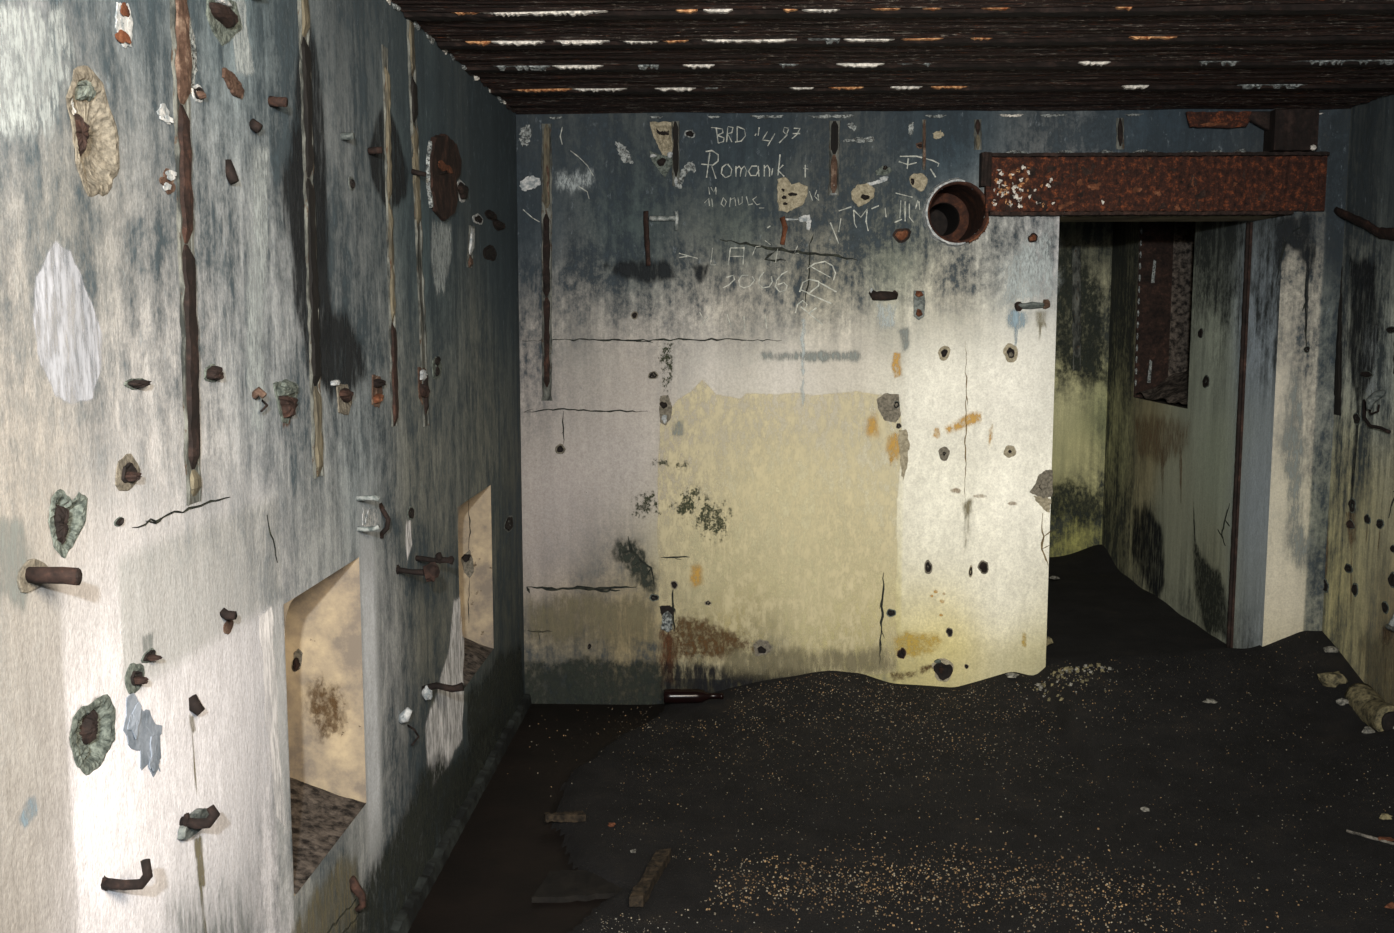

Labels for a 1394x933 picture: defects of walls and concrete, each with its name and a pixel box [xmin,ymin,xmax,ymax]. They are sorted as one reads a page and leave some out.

spalling [66,65,120,197]
corrosion [159,168,177,194]
corrosion [998,165,1101,212]
leakage [1007,235,1107,382]
spalling [48,489,88,558]
crack [132,497,230,528]
crack [267,515,278,563]
spalling [1030,470,1053,513]
leakage [223,620,234,634]
leakage [296,319,939,933]
spalling [69,693,162,777]
leakage [181,837,249,933]